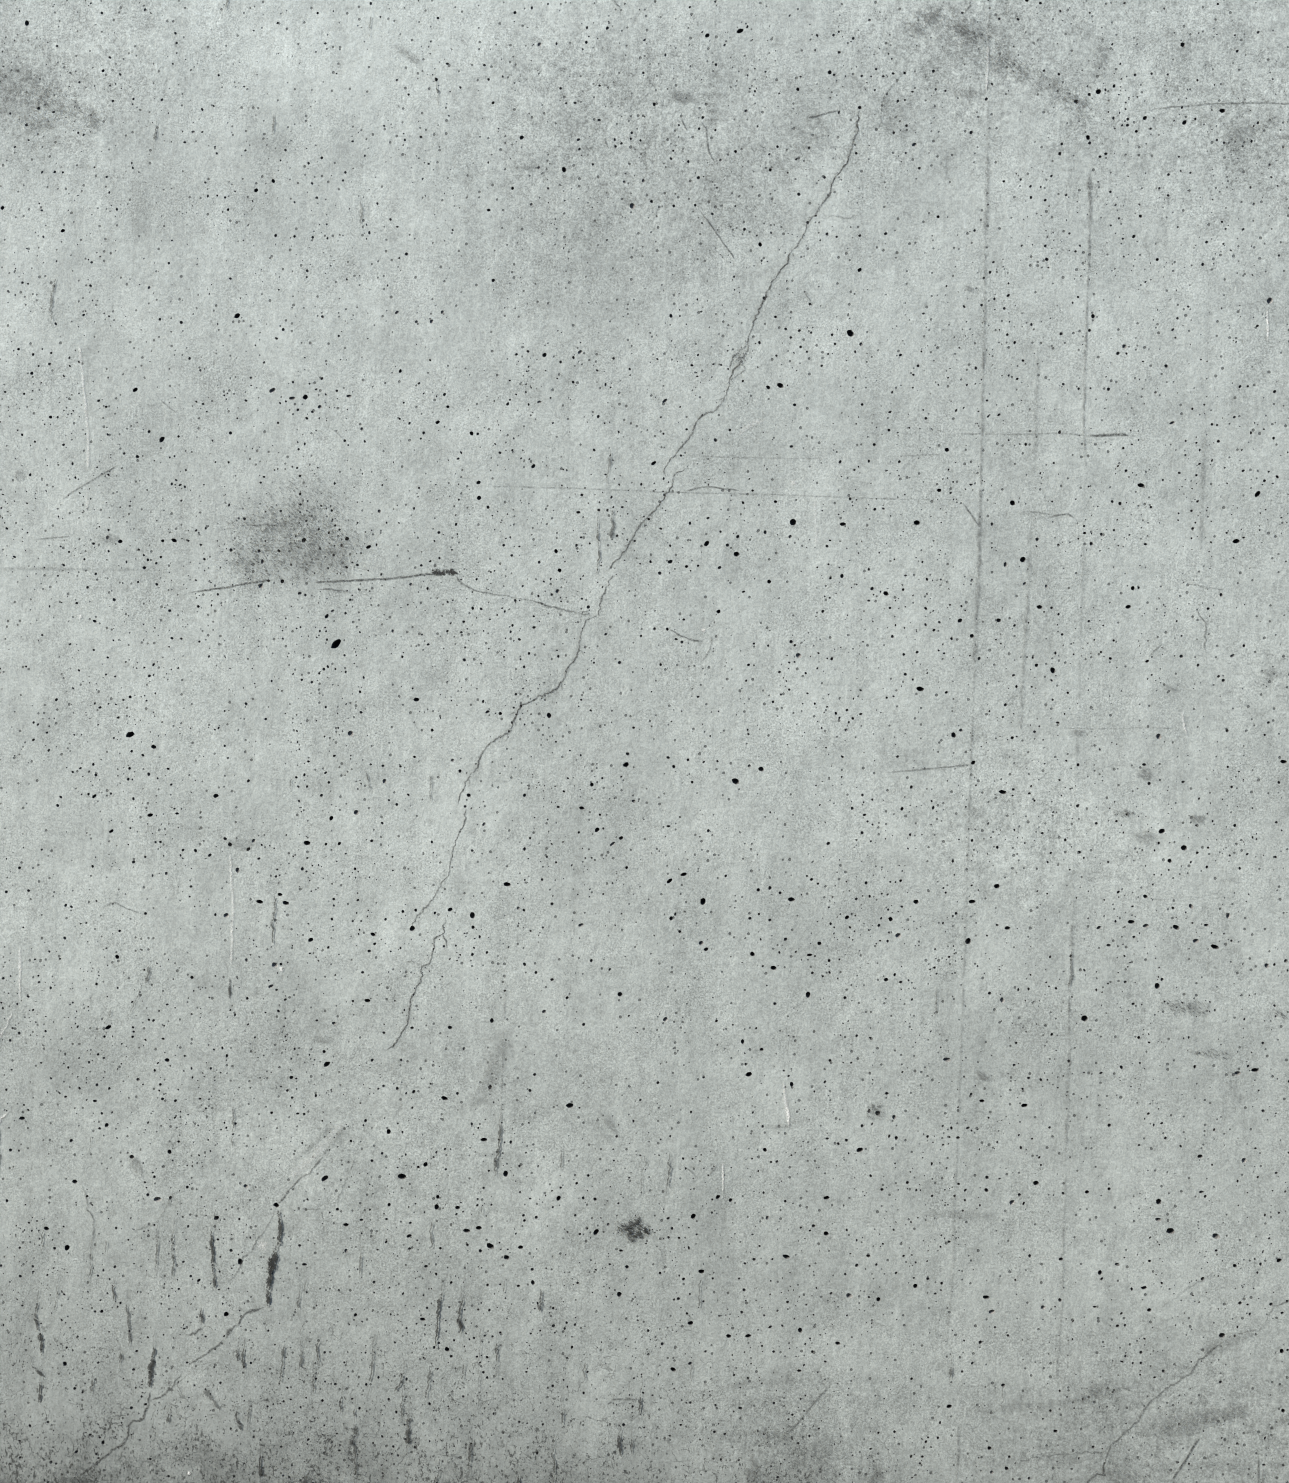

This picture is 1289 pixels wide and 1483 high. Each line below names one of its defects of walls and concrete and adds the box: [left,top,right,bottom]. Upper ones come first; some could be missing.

crack [318,569,491,594]
leakage [395,1374,412,1443]